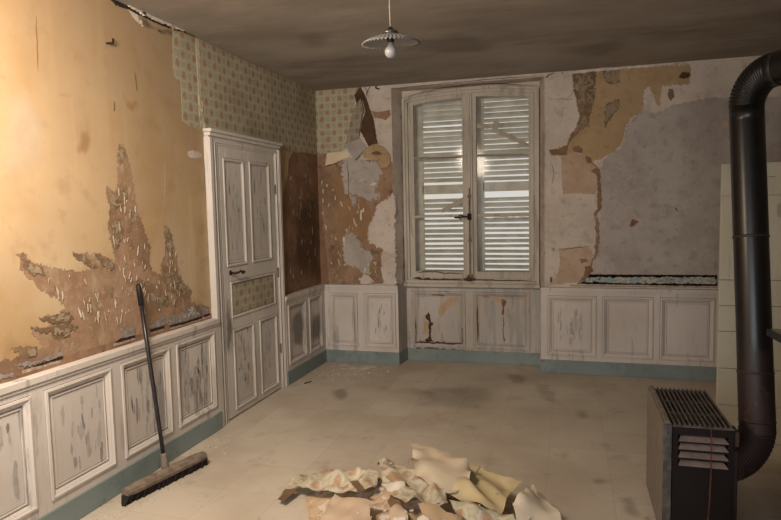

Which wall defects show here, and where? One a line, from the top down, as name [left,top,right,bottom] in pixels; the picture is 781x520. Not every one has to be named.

peeling [0,144,212,383]
crack [111,0,196,37]
peeling [127,5,398,295]
spalling [548,63,730,288]
spalling [765,96,781,162]